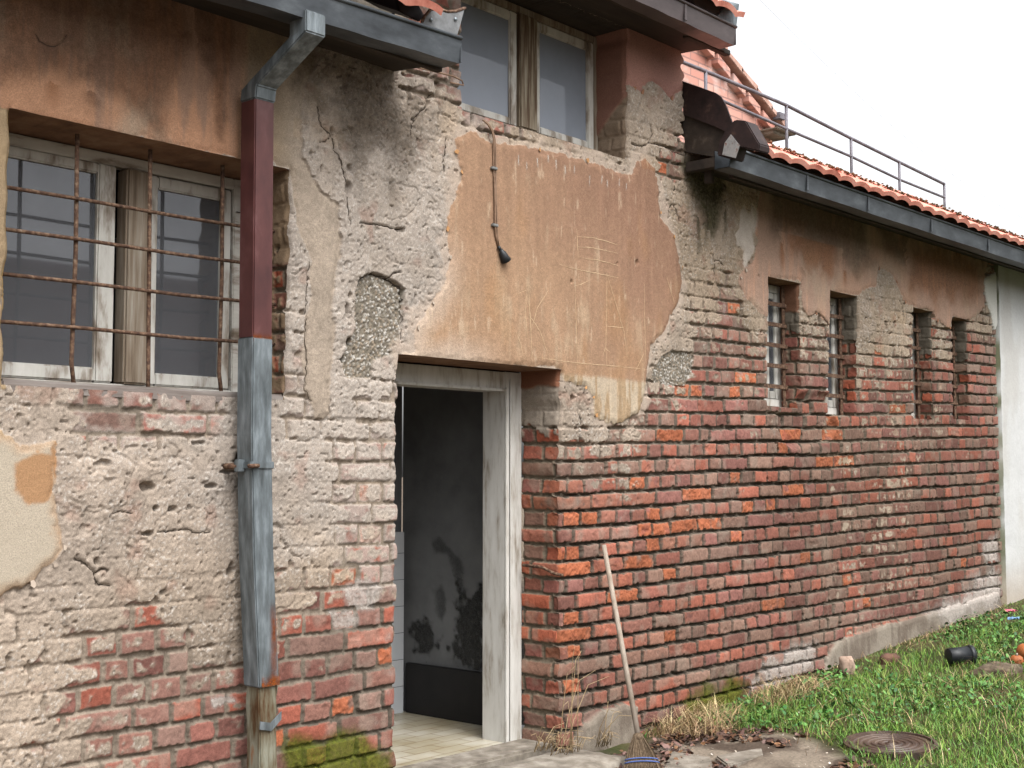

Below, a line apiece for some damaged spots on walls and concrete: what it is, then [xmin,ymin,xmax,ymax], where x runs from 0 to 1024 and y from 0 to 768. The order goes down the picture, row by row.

crack [316,106,405,230]
water stain [682,161,726,235]
peeling [798,298,830,346]
peeling [856,266,914,357]
peeling [558,374,642,456]
spalling [773,391,854,467]
crack [75,559,110,586]
peeling [2,428,242,624]
spalling [555,545,591,578]
spalling [619,506,742,581]
water stain [409,581,483,670]
spalling [555,610,591,658]